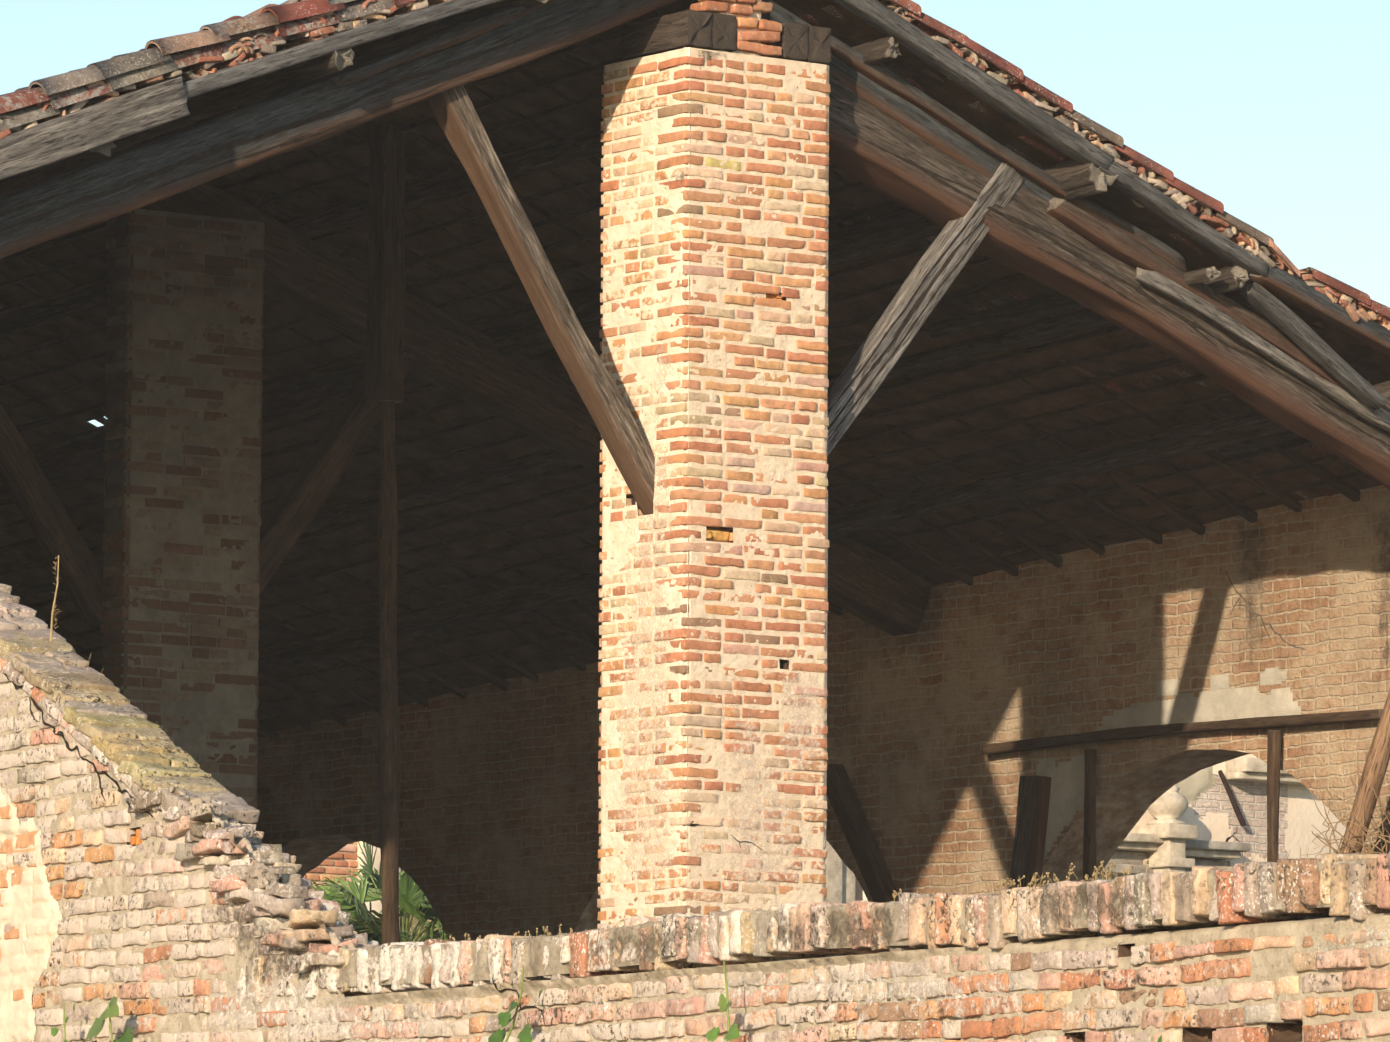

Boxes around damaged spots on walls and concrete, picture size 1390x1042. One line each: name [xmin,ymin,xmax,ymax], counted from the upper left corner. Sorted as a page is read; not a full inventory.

spalling [131,829,142,845]